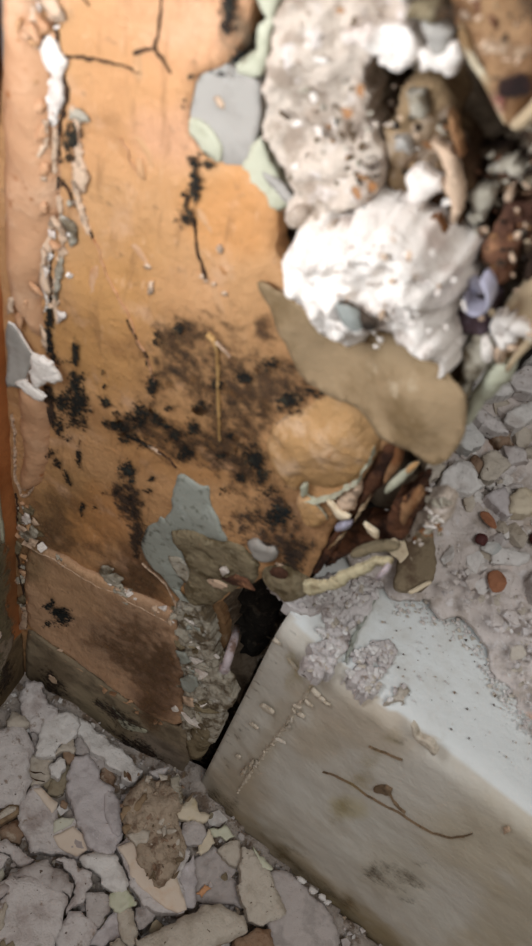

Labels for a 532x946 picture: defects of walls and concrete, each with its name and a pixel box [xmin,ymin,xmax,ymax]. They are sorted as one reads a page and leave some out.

peeling [15,12,50,49]
damp [57,122,86,164]
crack [28,0,172,382]
crack [193,218,227,296]
spalling [189,0,466,214]
damp [102,458,163,597]
damp [39,298,324,572]
spalling [141,474,410,768]